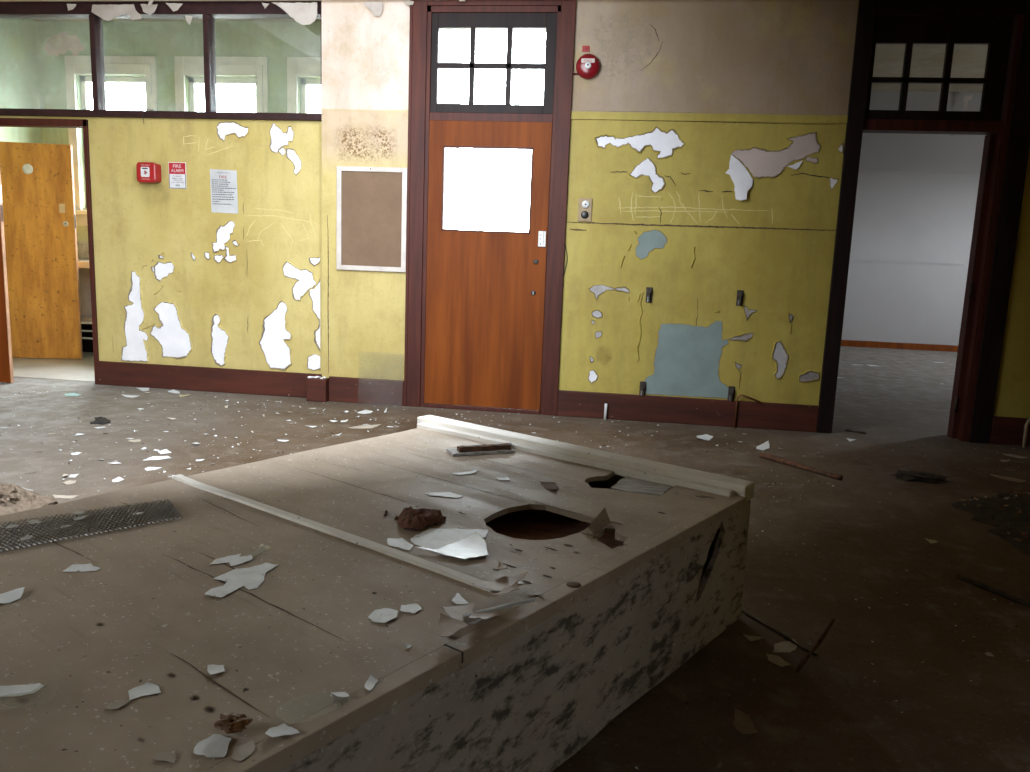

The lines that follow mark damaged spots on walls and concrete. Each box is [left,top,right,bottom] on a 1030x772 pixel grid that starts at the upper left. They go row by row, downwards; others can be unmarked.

peeling [91,0,192,25]
peeling [216,121,250,142]
peeling [269,122,303,176]
peeling [594,126,686,194]
peeling [726,131,821,200]
peeling [191,220,240,264]
peeling [635,229,668,260]
peeling [121,254,193,363]
peeling [210,313,230,367]
peeling [258,257,320,371]
peeling [588,284,630,339]
peeling [643,305,758,399]